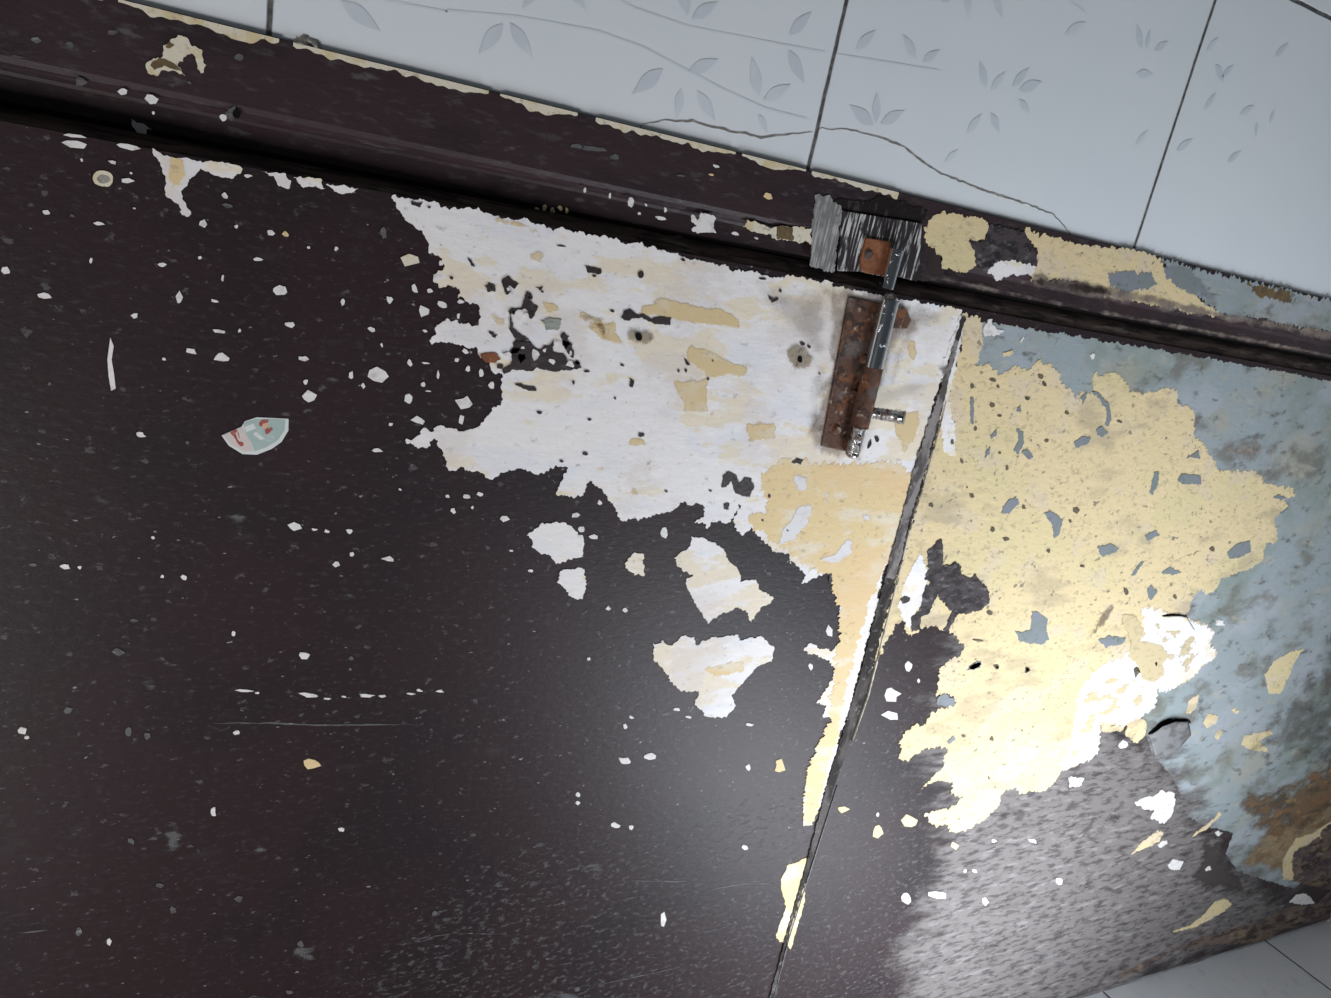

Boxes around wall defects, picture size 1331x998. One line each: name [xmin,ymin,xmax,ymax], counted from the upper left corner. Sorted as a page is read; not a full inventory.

peeling [118,0,578,116]
peeling [61,133,87,162]
peeling [109,94,358,228]
crack [640,119,1071,234]
peeling [273,285,287,295]
peeling [107,338,116,391]
peeling [302,380,317,402]
rust [811,291,877,457]
peeling [288,522,329,533]
peeling [347,117,1331,998]
peeling [299,692,386,700]
rust [1243,760,1331,871]